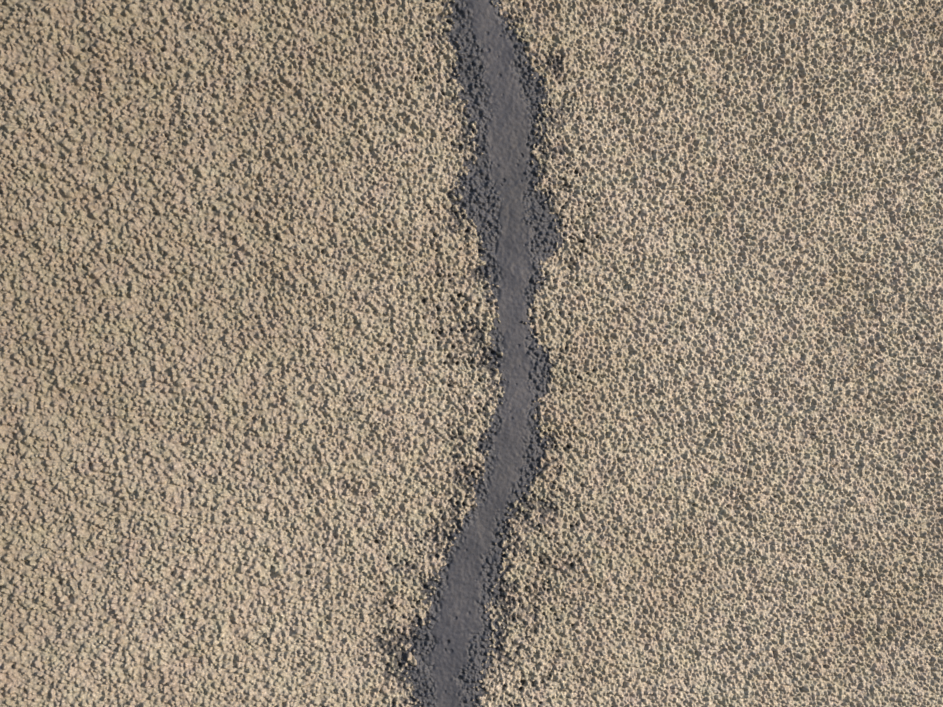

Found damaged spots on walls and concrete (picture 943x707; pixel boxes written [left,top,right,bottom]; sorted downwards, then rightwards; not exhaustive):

crack [362,0,600,707]